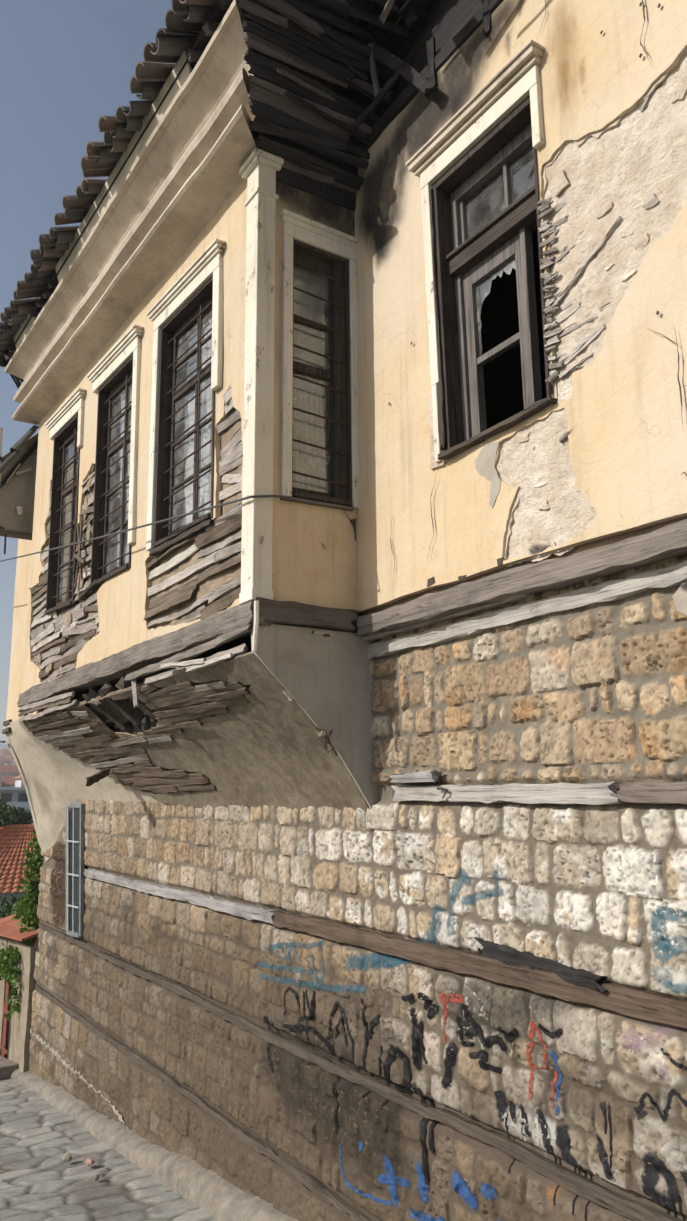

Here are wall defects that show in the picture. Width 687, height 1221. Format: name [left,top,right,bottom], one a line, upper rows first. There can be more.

crack [640,0,649,61]
leakage [405,39,545,178]
flaking render [496,48,687,567]
crack [647,327,687,424]